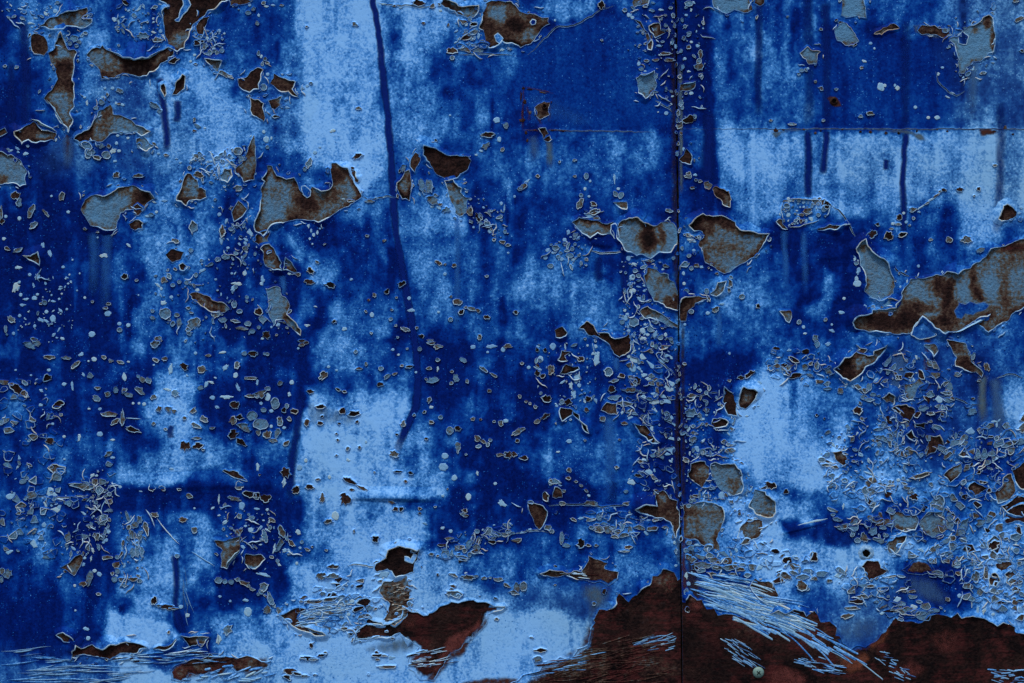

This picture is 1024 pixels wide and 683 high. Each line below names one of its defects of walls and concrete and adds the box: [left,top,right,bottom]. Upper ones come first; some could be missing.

peeling [0,0,541,596]
peeling [211,0,1024,683]
peeling [150,595,190,617]
rust [428,621,486,680]
rust [531,628,671,683]